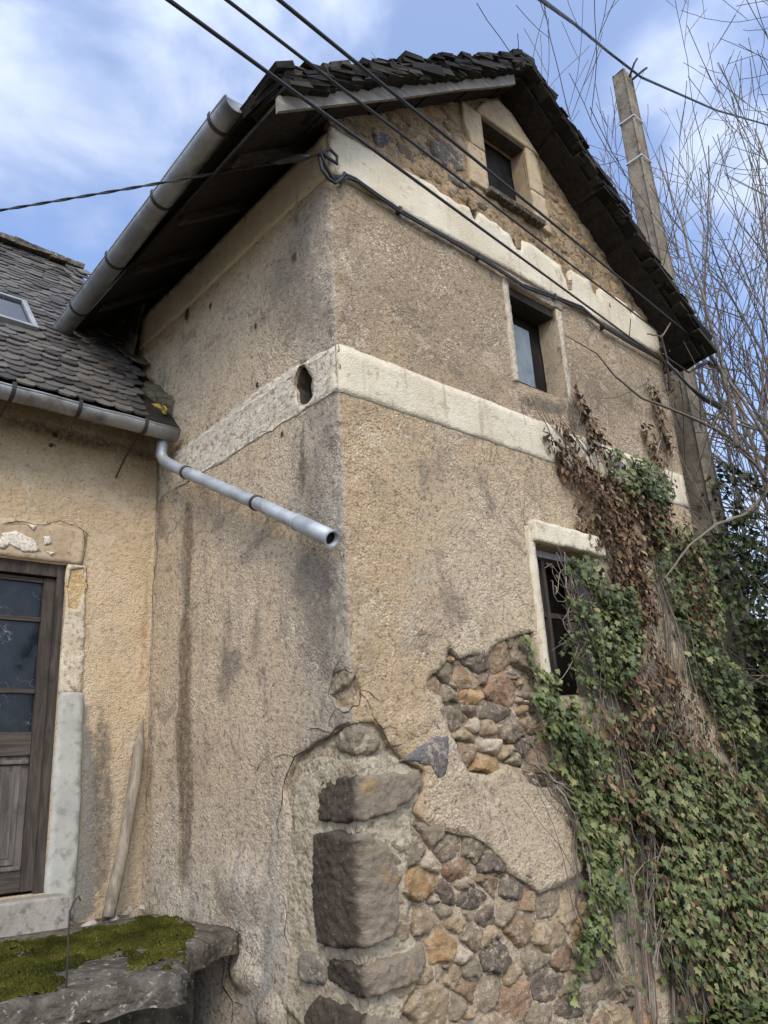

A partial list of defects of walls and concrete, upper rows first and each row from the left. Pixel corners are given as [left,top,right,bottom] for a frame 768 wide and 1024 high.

peeling [158,346,338,502]
peeling [0,524,54,556]
leakage [176,505,193,880]
crack [256,653,401,838]
spalling [427,635,577,788]
spalling [391,820,662,1024]